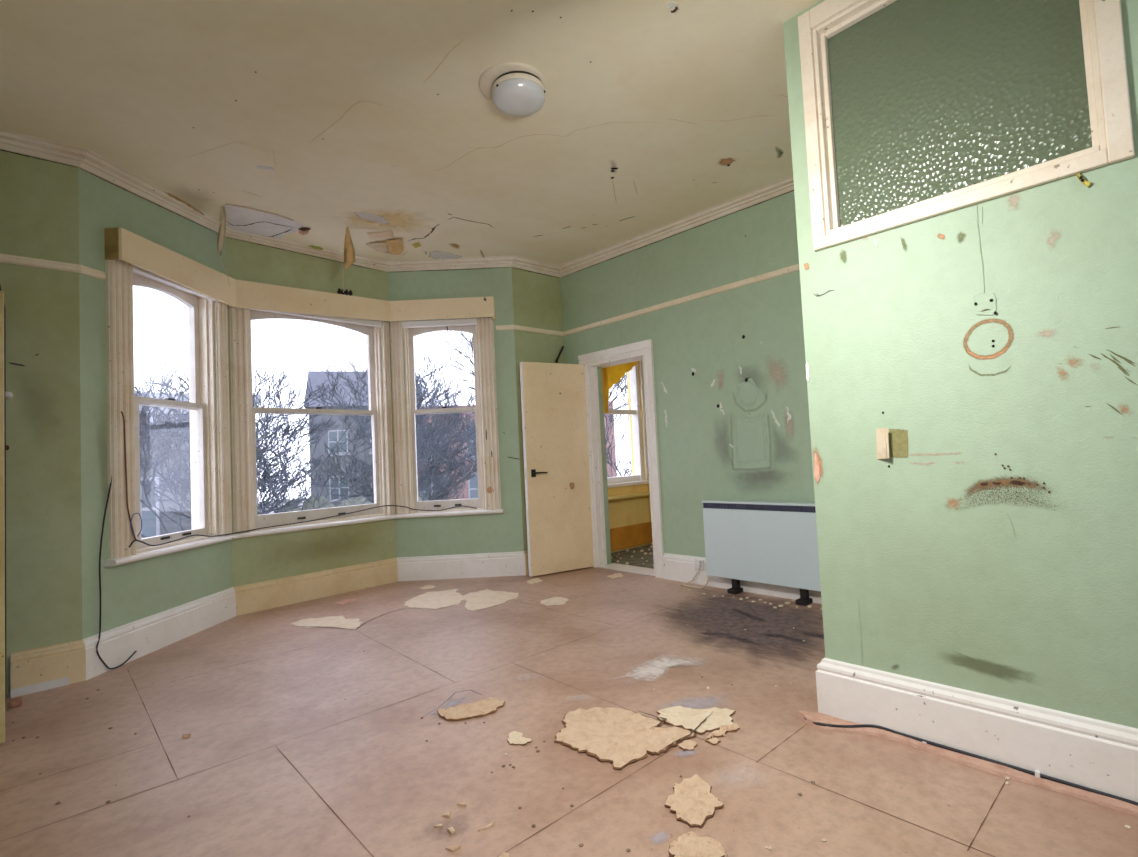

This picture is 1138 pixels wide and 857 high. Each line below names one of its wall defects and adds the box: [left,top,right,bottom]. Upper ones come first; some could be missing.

spalling [217,204,310,256]
peeling [344,212,460,269]